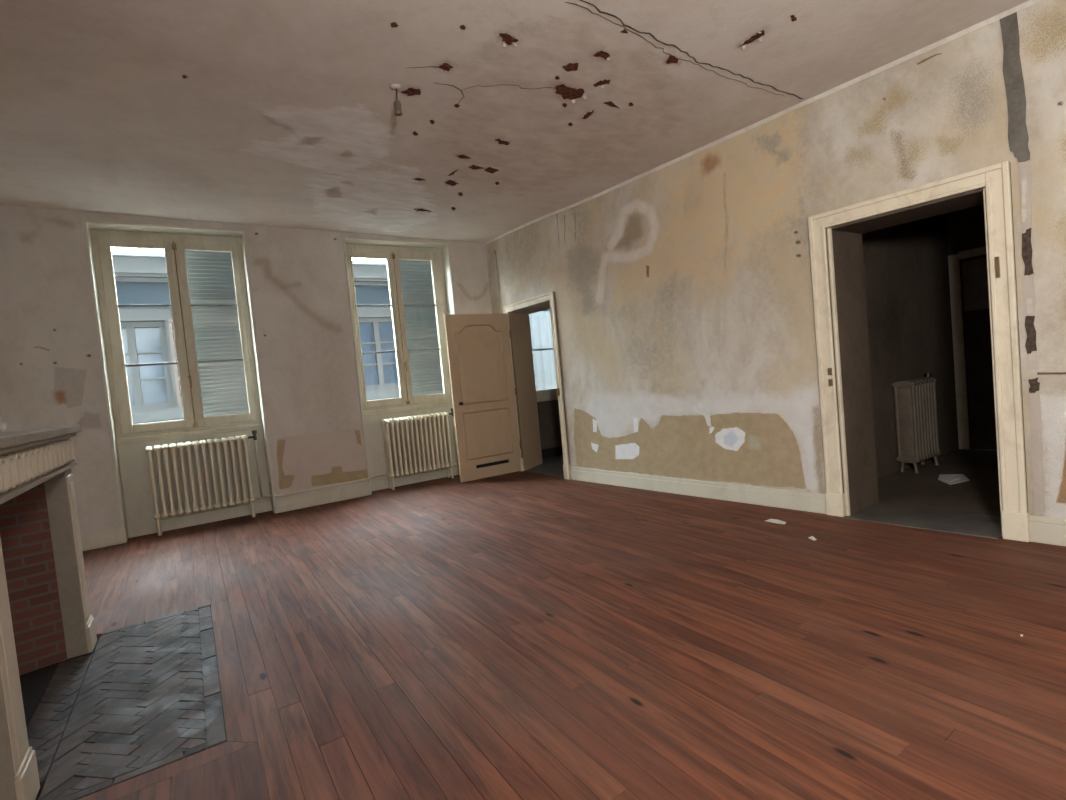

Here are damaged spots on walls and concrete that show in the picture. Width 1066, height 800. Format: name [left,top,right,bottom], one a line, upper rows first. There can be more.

spalling [435,58,458,74]
spalling [493,29,523,47]
spalling [590,47,616,61]
spalling [662,49,685,68]
crack [565,0,803,99]
spalling [731,26,770,50]
spalling [399,84,425,97]
crack [410,66,552,104]
spalling [543,63,633,126]
spalling [1000,12,1066,516]
peeling [574,403,807,489]